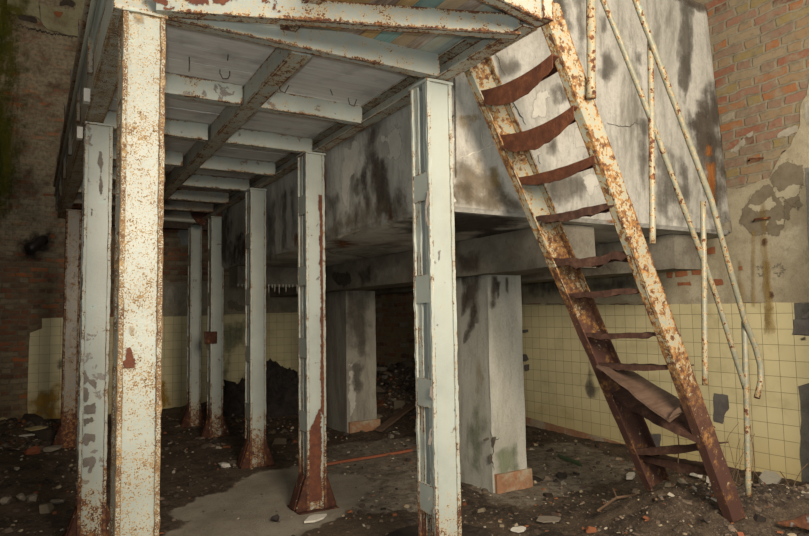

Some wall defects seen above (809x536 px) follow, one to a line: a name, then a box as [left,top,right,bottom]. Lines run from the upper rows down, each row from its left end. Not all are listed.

leakage [497,60,518,74]
leakage [602,54,615,79]
leakage [679,0,708,92]
leakage [329,127,413,235]
leakage [454,165,523,238]
leakage [658,156,689,212]
rust [707,145,715,200]
leakage [690,84,753,218]
flaking render [721,162,804,236]
leakage [459,255,479,343]
rust [123,348,136,368]
rust [309,180,326,502]